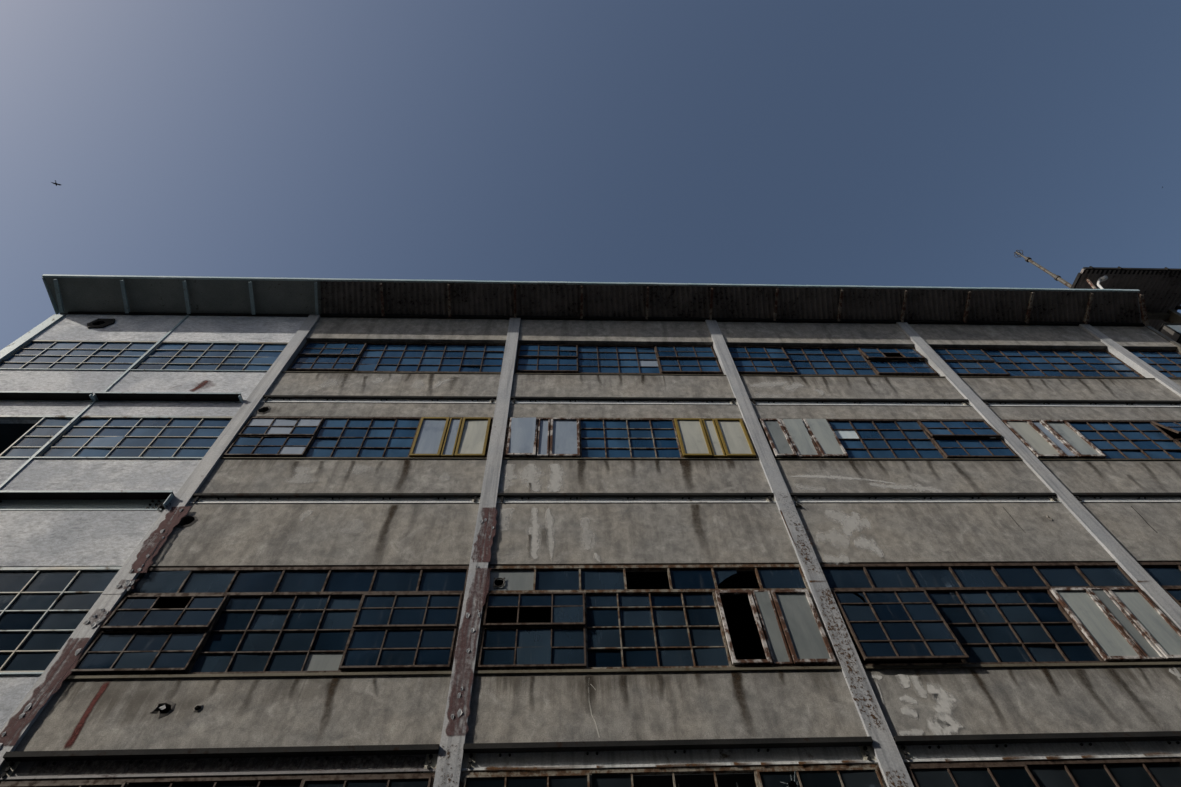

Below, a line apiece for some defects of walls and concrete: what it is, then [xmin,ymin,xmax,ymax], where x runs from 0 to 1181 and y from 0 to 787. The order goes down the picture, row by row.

water stain [499,464,563,492]
water stain [528,508,554,559]
corrosion [780,510,884,729]
corrosion [65,682,109,747]